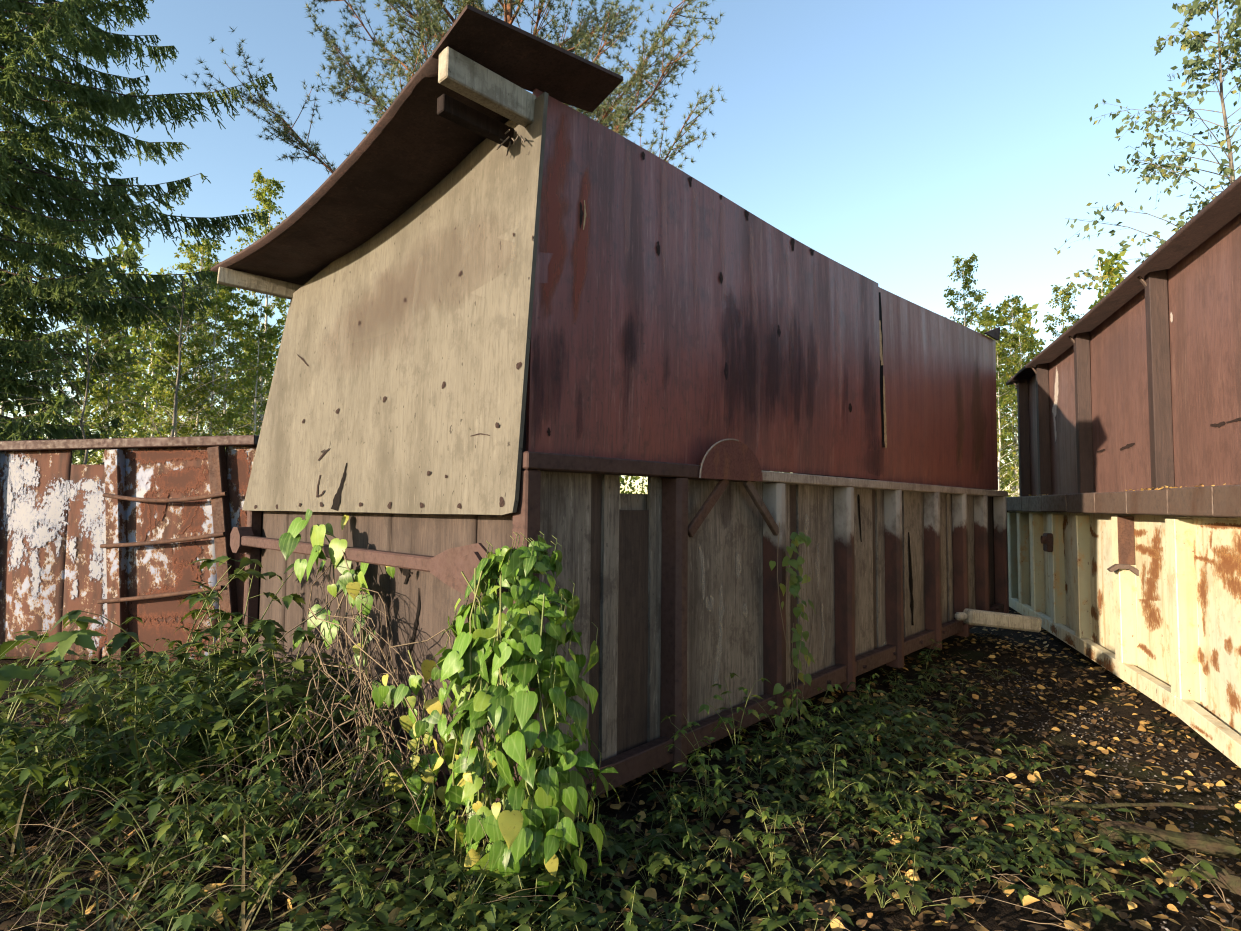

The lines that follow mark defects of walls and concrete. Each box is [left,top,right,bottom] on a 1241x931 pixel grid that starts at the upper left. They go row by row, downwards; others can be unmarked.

rust [541,118,590,312]
peeling [0,452,108,648]
rust [1051,590,1114,674]
rust [1134,527,1163,630]
rust [1194,522,1241,675]
rust [1200,684,1240,730]